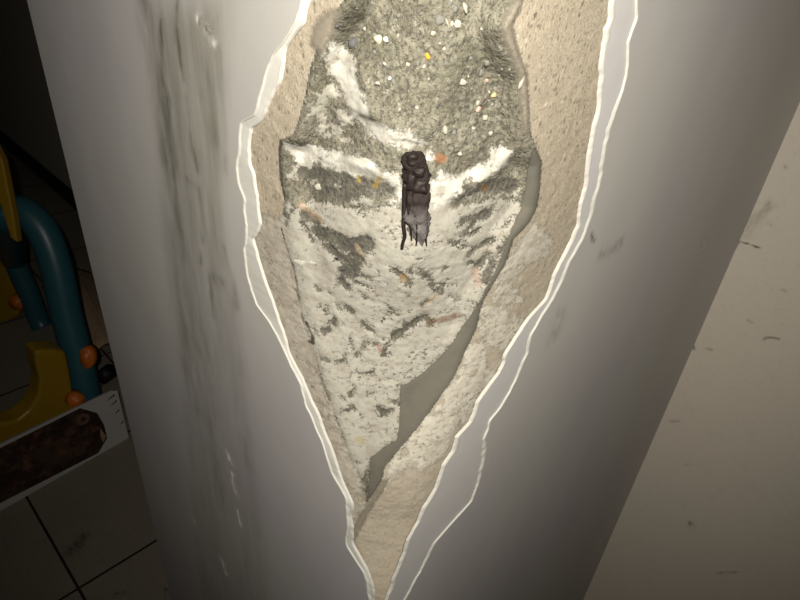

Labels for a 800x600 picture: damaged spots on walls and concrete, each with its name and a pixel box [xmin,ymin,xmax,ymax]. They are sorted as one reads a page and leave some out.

spalling [235,0,638,600]